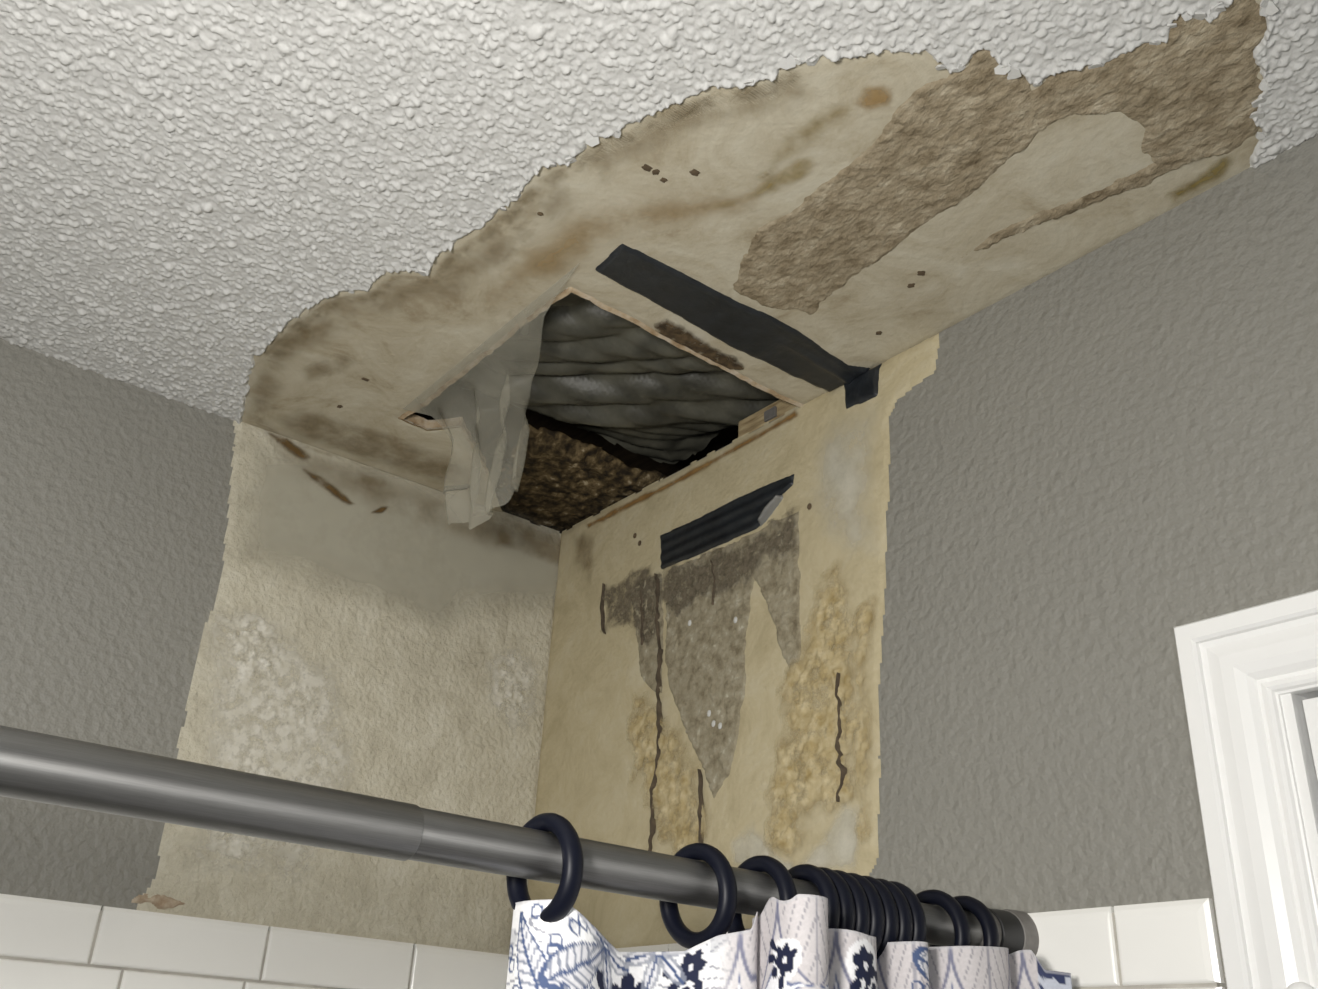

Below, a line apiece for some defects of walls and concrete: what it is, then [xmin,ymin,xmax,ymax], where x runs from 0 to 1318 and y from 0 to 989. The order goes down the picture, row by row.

peeling [176,0,1279,876]
crack [599,583,607,634]
crack [640,573,663,851]
crack [835,672,847,802]
crack [696,769,704,843]
peeling [131,823,513,955]
peeling [527,879,559,900]
peeling [573,888,677,948]
peeling [678,904,716,932]
peeling [742,914,759,929]